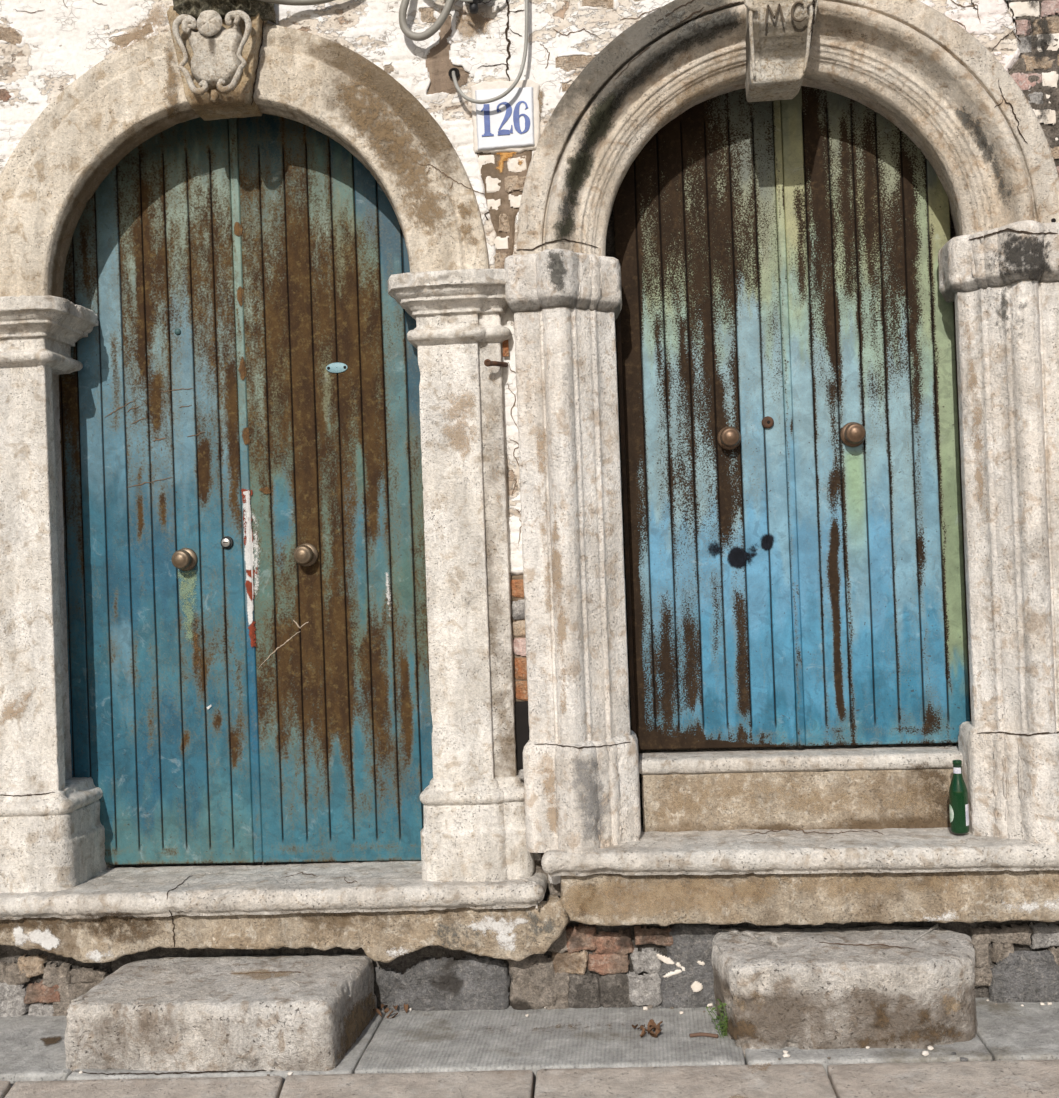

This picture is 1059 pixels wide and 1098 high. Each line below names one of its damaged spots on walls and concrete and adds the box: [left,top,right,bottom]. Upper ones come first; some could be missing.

peeling [0,20,28,48]
crack [950,0,1021,51]
peeling [0,82,15,103]
spalling [1004,0,1059,177]
leakage [547,0,741,293]
leakage [955,107,1010,202]
spalling [477,150,532,269]
rust [179,572,201,667]
leakage [0,912,160,943]
crack [167,875,193,947]